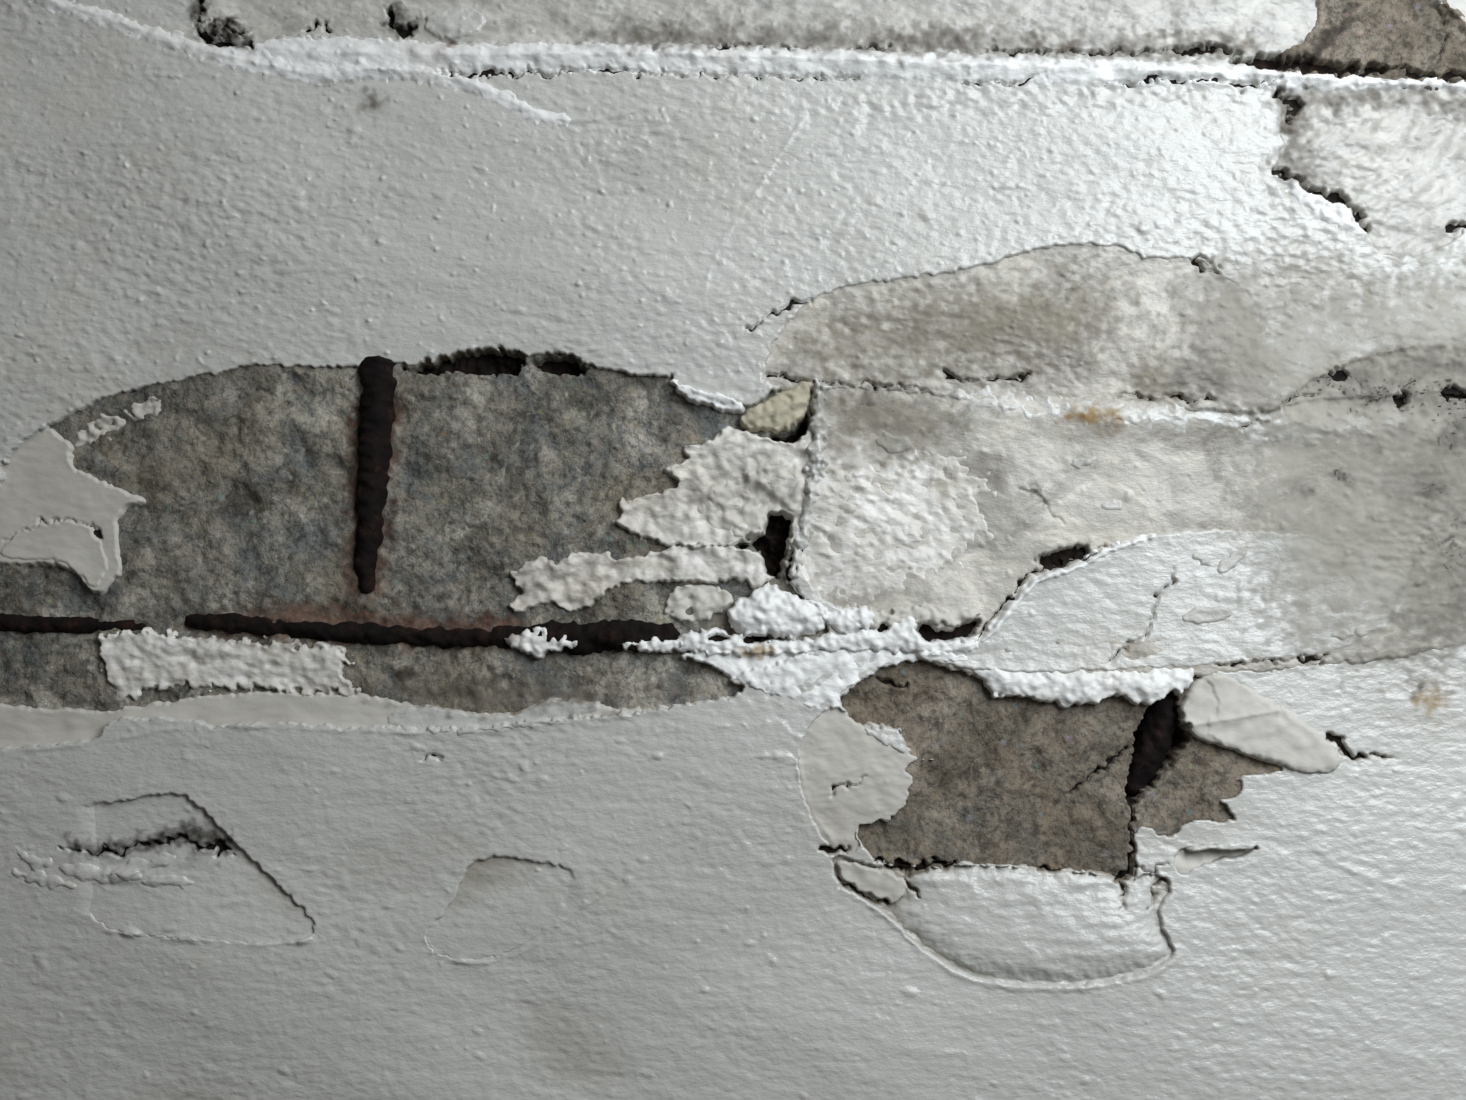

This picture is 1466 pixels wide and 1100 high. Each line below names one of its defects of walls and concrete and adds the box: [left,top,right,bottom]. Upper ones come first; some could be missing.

crack [199,0,254,48]
crack [388,11,413,39]
crack [442,68,640,79]
crack [963,53,1045,87]
crack [1081,46,1466,88]
peeling [195,0,1466,259]
leakage [949,286,1111,368]
crack [943,371,1030,383]
crack [1241,370,1347,428]
leakage [1191,258,1466,663]
rust [199,400,518,648]
spalling [0,243,1466,985]